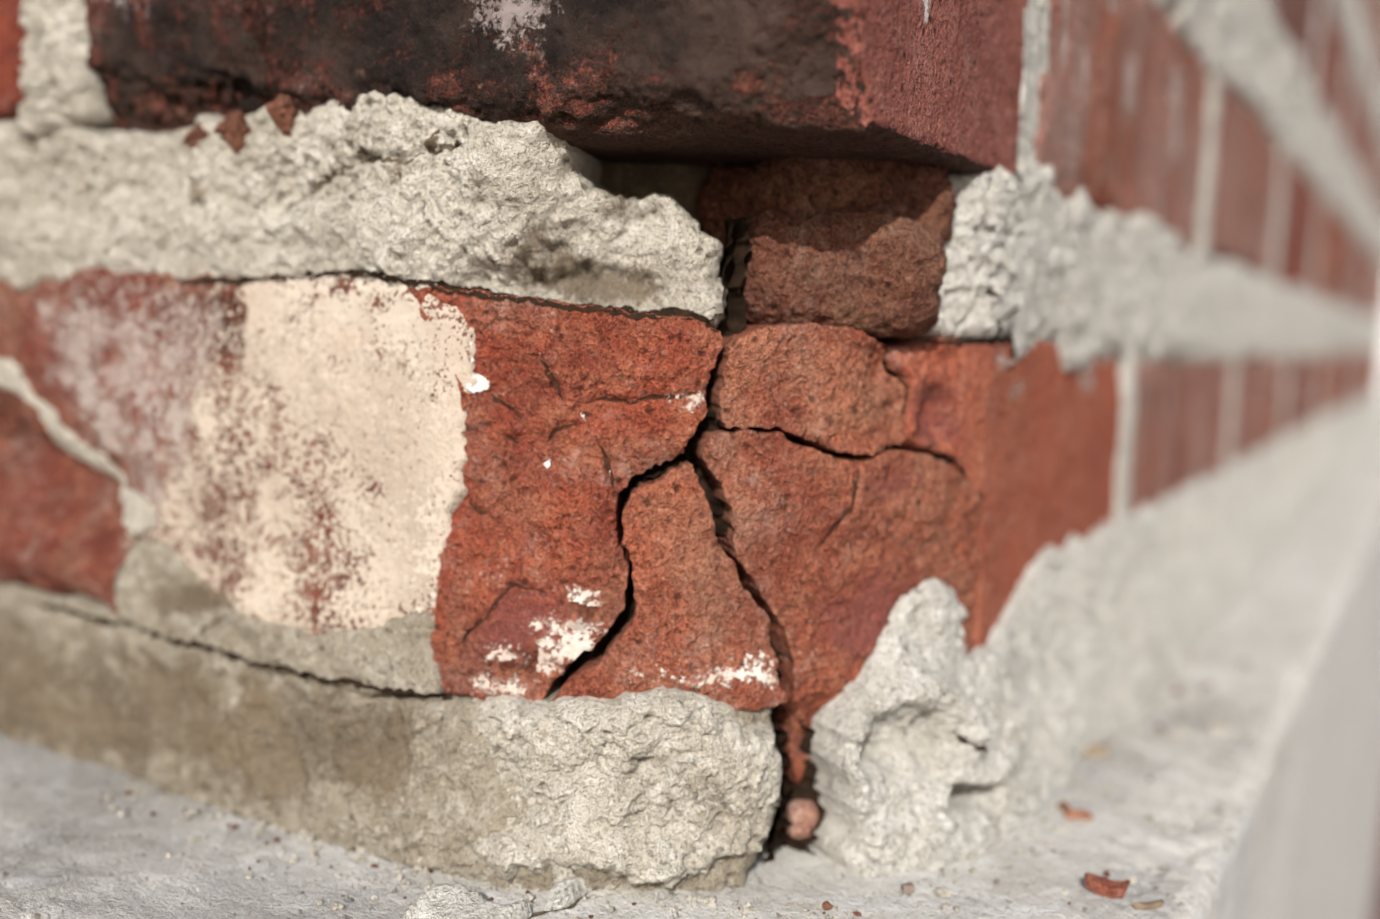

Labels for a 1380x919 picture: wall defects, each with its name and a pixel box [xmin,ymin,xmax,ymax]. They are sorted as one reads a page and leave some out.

crack [158,216,752,338]
water stain [669,390,704,413]
crack [882,285,1042,412]
spalling [121,272,983,784]
crack [491,358,983,684]
crack [28,535,452,701]
crack [459,583,542,656]
water stain [470,585,608,698]
water stain [629,650,778,691]
water stain [823,571,916,659]
crack [763,631,826,864]
crack [954,728,989,757]